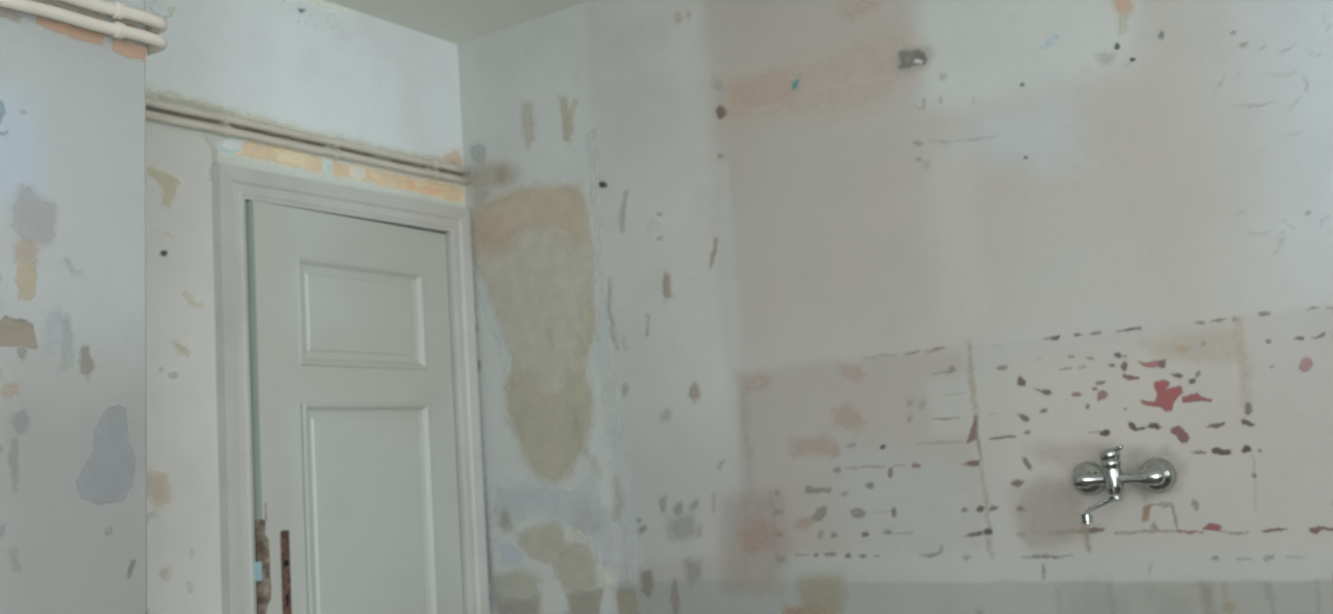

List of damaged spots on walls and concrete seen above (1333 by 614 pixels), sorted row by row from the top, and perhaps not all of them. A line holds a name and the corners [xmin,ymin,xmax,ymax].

peeling [16,241,36,300]
peeling [0,316,37,358]
peeling [220,138,595,481]
peeling [1072,381,1108,409]
peeling [1109,353,1261,455]
peeling [77,405,135,504]
peeling [806,486,877,558]
peeling [493,571,538,614]
peeling [501,505,637,614]